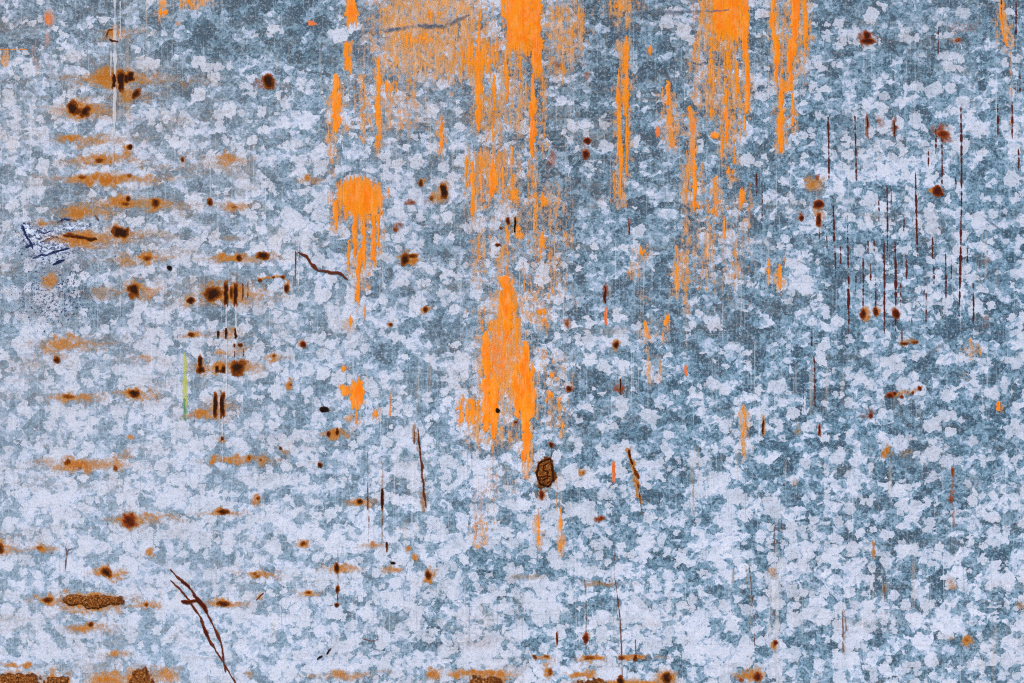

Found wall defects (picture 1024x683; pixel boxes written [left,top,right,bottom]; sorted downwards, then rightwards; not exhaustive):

corrosion [64,66,186,109]
corrosion [49,99,113,120]
corrosion [405,179,449,205]
corrosion [799,107,988,347]
corrosion [184,275,290,307]
corrosion [187,391,232,422]
corrosion [625,448,643,511]
corrosion [26,589,160,633]
corrosion [532,631,558,678]
corrosion [0,662,71,683]
corrosion [89,666,178,683]
corrosion [427,667,511,683]